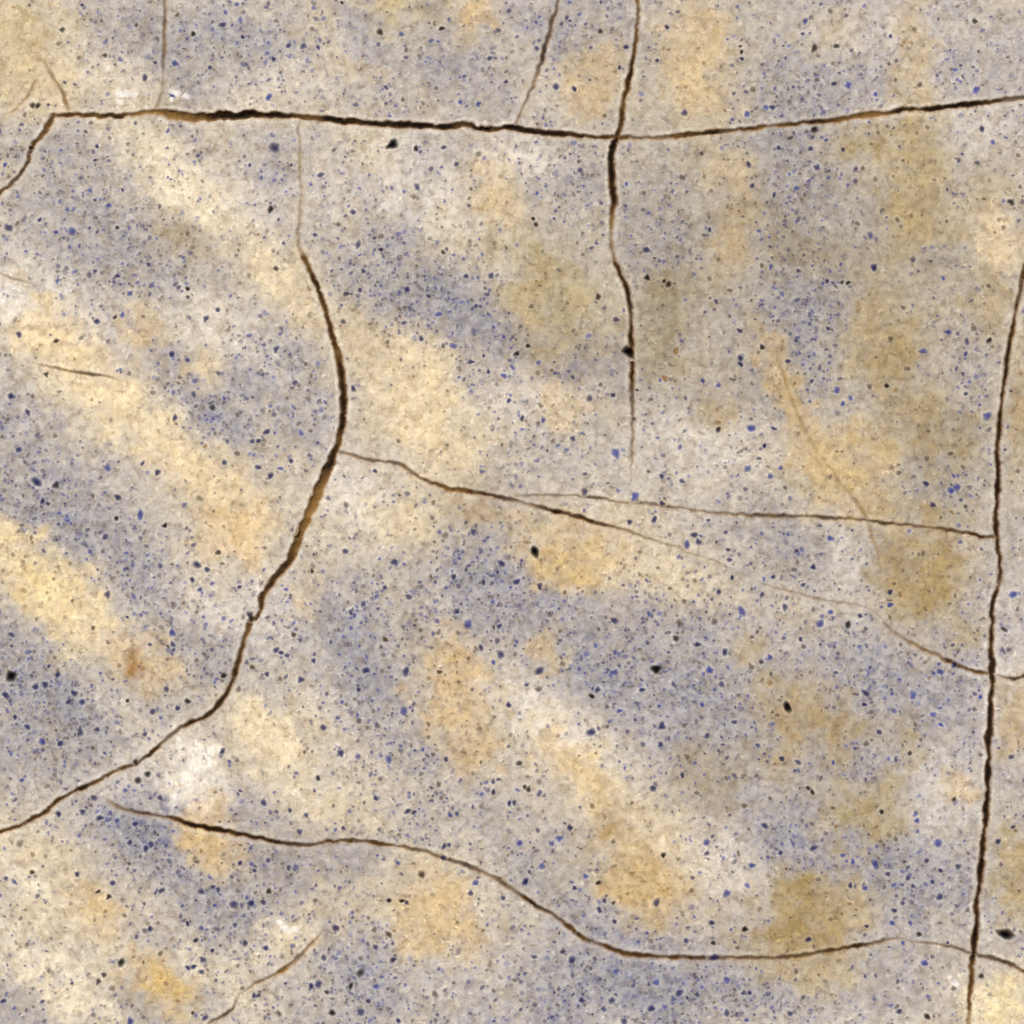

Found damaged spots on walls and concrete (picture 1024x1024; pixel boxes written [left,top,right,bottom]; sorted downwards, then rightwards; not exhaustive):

crack [195,920,329,1024]
crack [0,0,615,844]
crack [95,789,973,970]
crack [339,0,1024,1024]